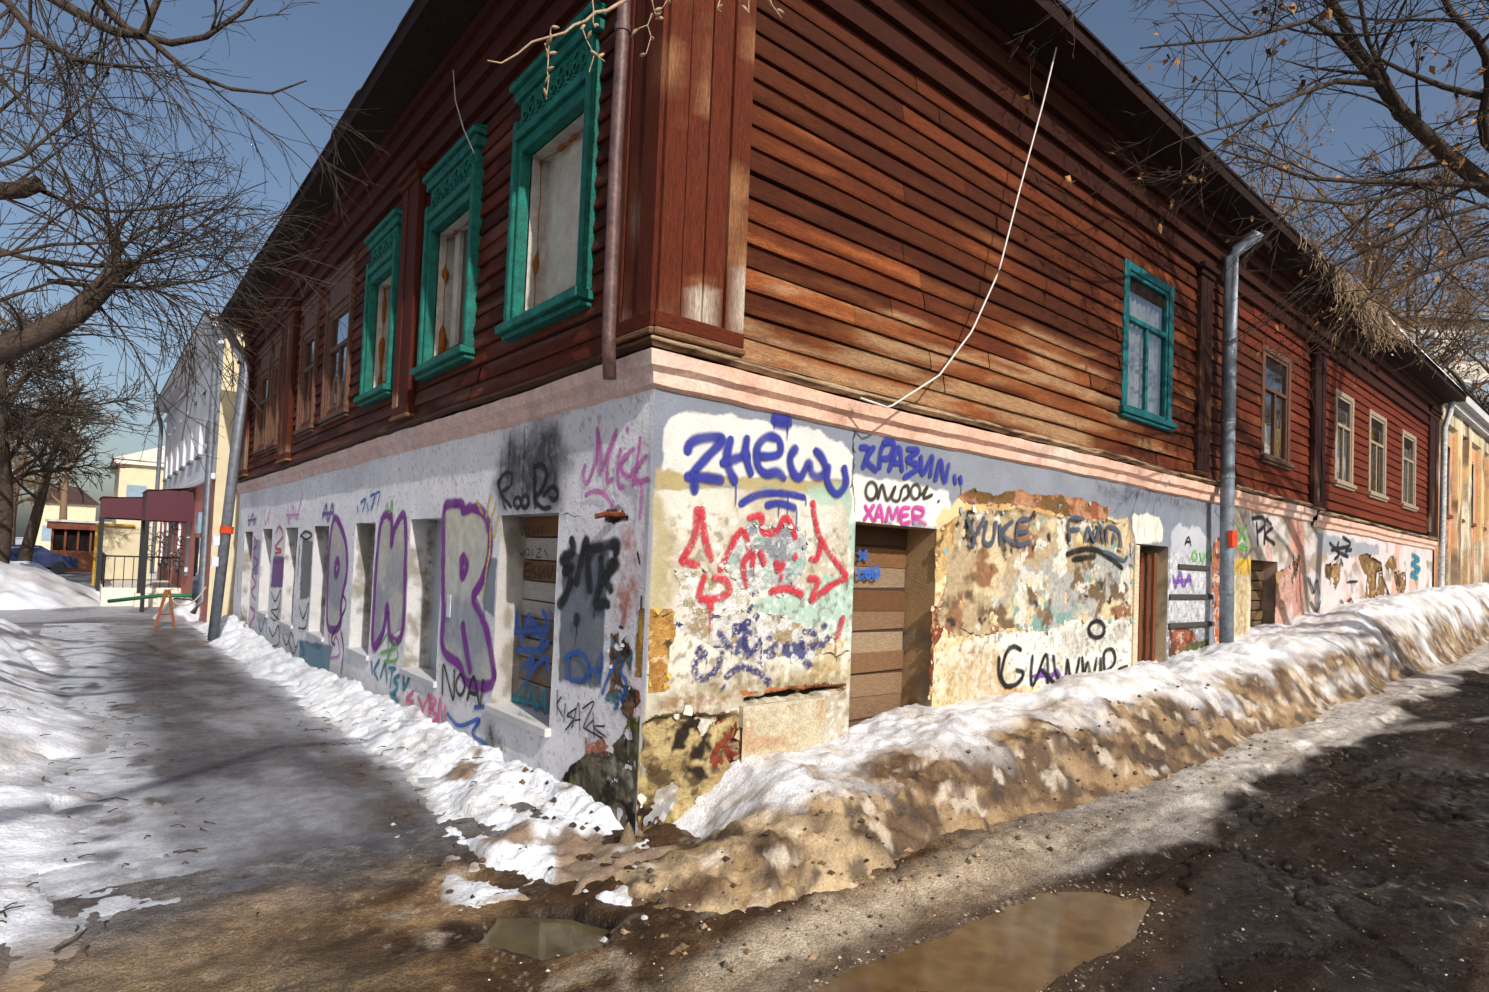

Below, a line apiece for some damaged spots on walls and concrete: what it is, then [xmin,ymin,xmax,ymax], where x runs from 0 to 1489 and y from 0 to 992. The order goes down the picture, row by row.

spalling [605,520,846,836]
peeling [928,488,1134,700]
spalling [1325,560,1341,590]
spalling [1359,553,1406,599]